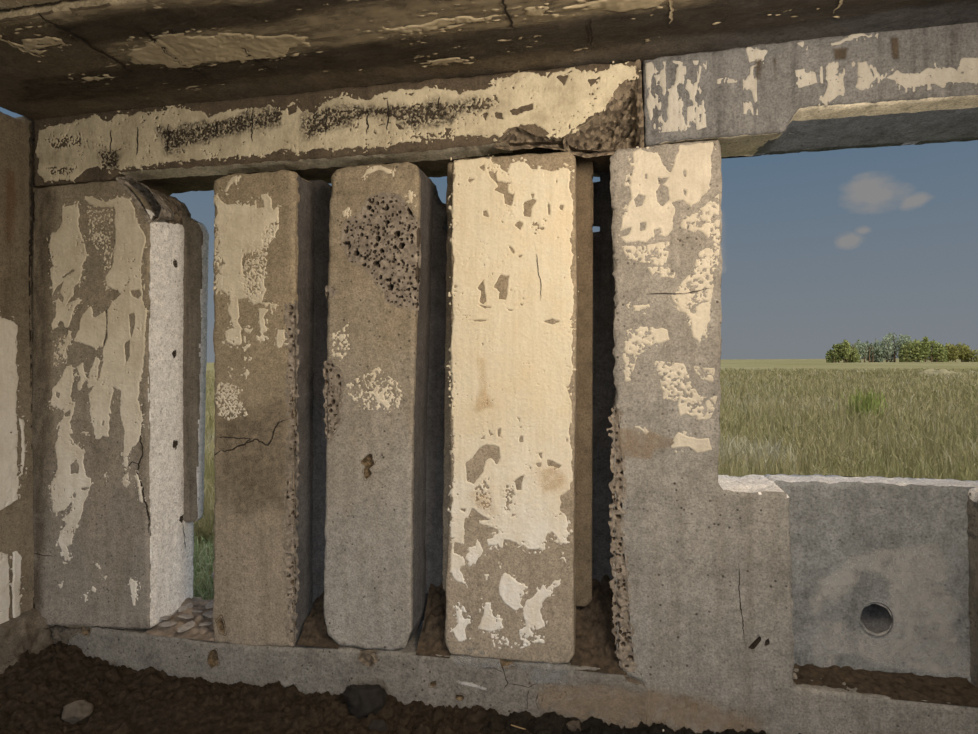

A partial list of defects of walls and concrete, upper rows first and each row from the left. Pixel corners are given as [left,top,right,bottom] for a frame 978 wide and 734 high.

crack [0,0,134,76]
peeling [68,28,323,82]
crack [501,0,515,32]
crack [667,0,675,24]
peeling [795,58,978,107]
leakage [156,108,280,154]
leakage [301,97,481,136]
peeling [33,59,721,686]
peeling [0,311,28,510]
crack [214,418,290,456]
peeling [0,550,24,624]
peeling [450,563,561,670]